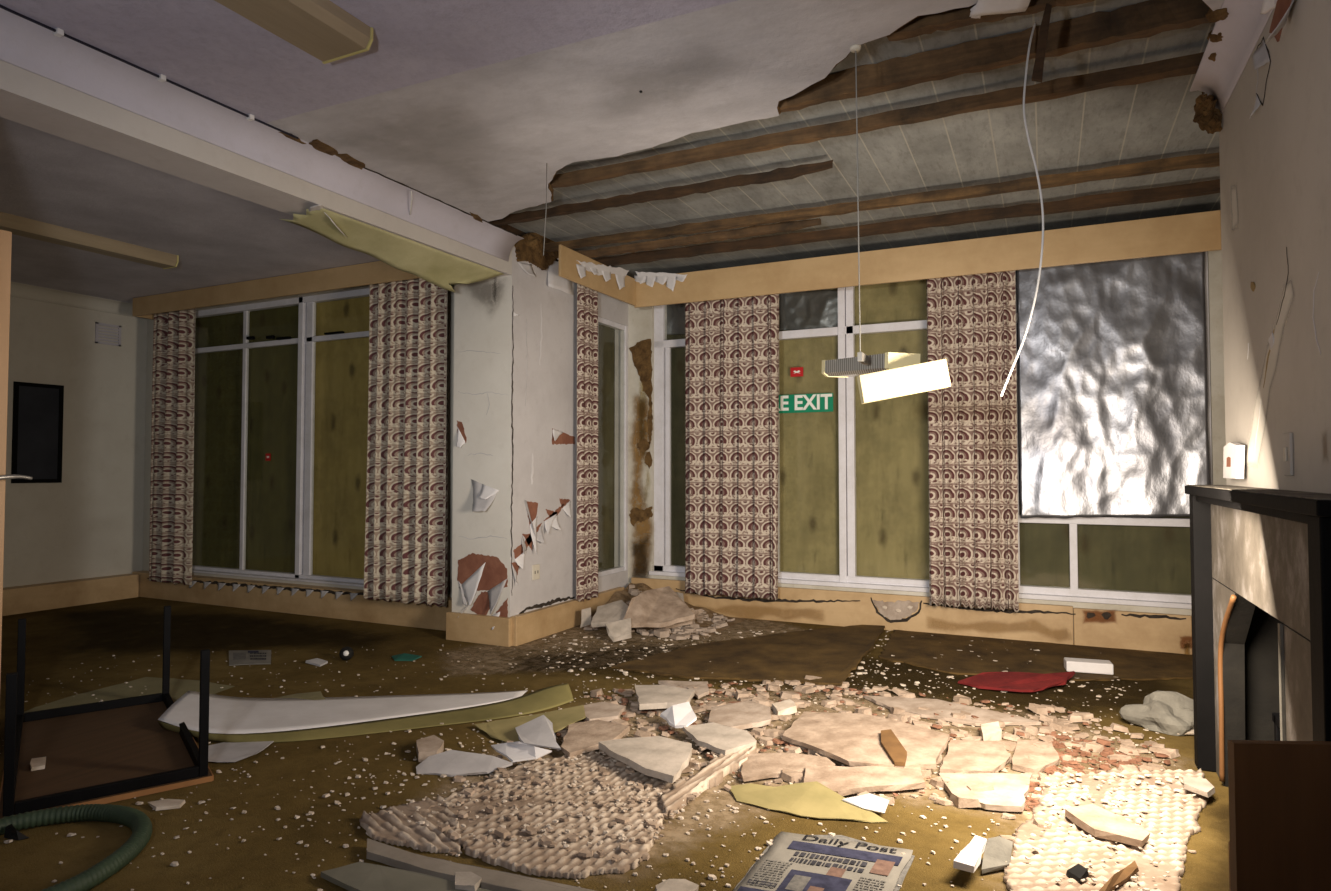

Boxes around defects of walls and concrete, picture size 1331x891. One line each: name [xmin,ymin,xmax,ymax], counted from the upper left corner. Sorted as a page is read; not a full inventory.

peeling [969,0,1031,19]
flaking render [1202,0,1229,61]
peeling [1260,0,1292,42]
flaking render [1193,92,1222,134]
peeling [514,232,688,295]
peeling [456,421,467,448]
peeling [552,428,575,445]
peeling [471,479,499,512]
water stain [631,385,652,578]
peeling [457,498,571,630]